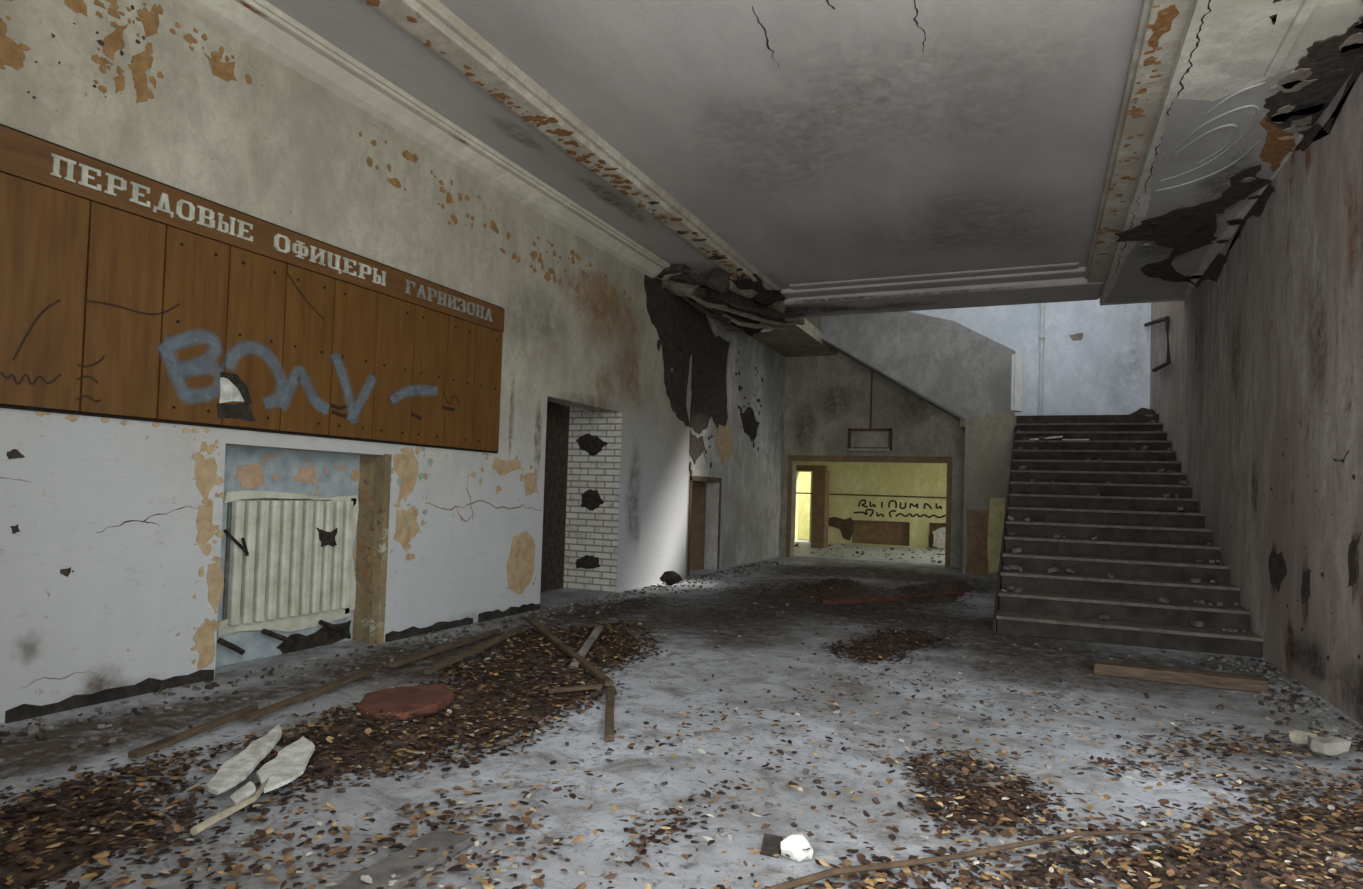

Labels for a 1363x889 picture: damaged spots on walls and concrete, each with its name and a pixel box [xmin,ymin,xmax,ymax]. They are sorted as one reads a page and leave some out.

peeling [0,0,38,70]
peeling [64,0,252,103]
crack [752,6,779,67]
crack [913,0,926,53]
peeling [1104,0,1363,303]
flaking render [430,170,763,478]
crack [97,506,193,533]
peeling [152,422,375,670]
peeling [389,446,433,573]
peeling [471,452,539,500]
peeling [506,531,536,594]
crack [20,671,97,689]